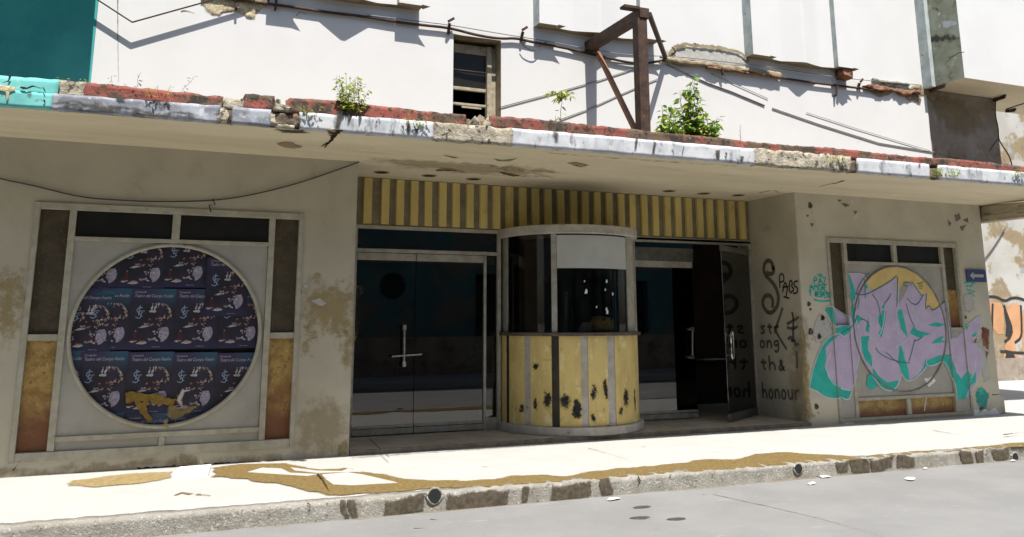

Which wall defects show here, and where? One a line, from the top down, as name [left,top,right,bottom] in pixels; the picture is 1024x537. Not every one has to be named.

spalling [201,0,270,18]
spalling [659,42,782,79]
spalling [835,68,937,102]
spalling [214,107,233,126]
spalling [269,99,300,129]
spalling [463,116,494,128]
crack [321,130,343,148]